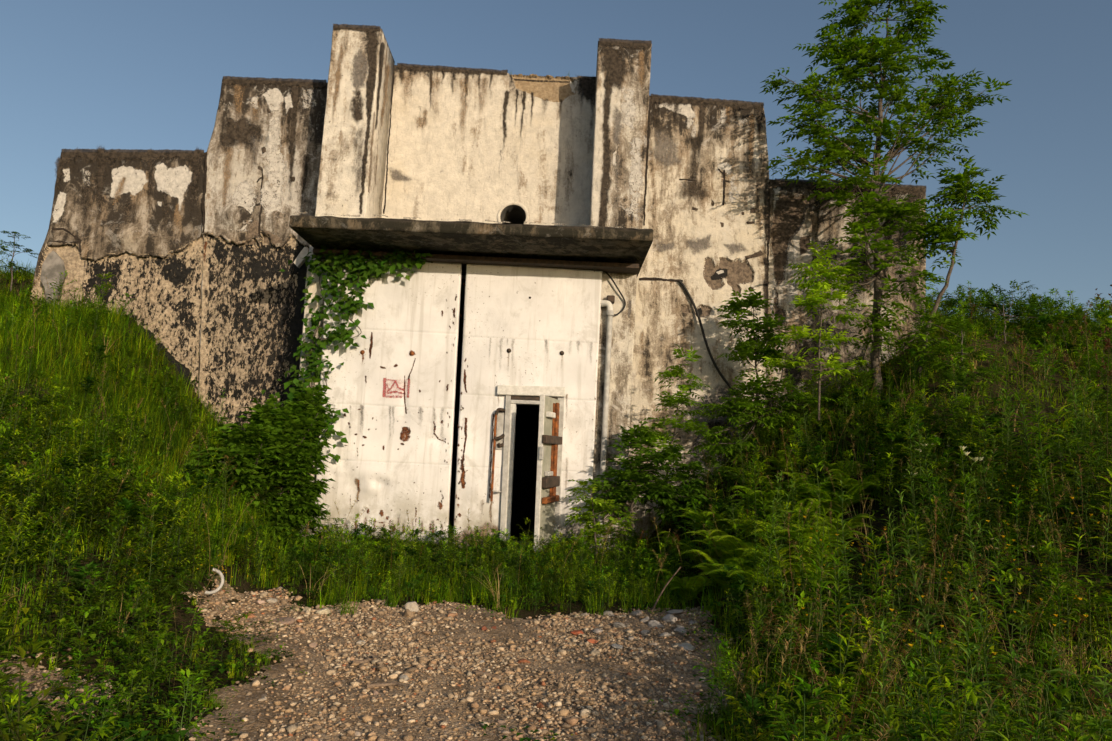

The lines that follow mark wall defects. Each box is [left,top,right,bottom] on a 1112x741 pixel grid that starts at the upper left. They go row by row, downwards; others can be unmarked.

damp [55,147,204,227]
spalling [30,88,316,430]
damp [220,24,508,214]
damp [500,90,562,152]
spalling [512,74,578,102]
damp [577,38,652,226]
damp [651,94,764,198]
spalling [703,187,819,325]
damp [763,178,926,313]
rust [362,332,419,450]
rust [341,359,504,547]